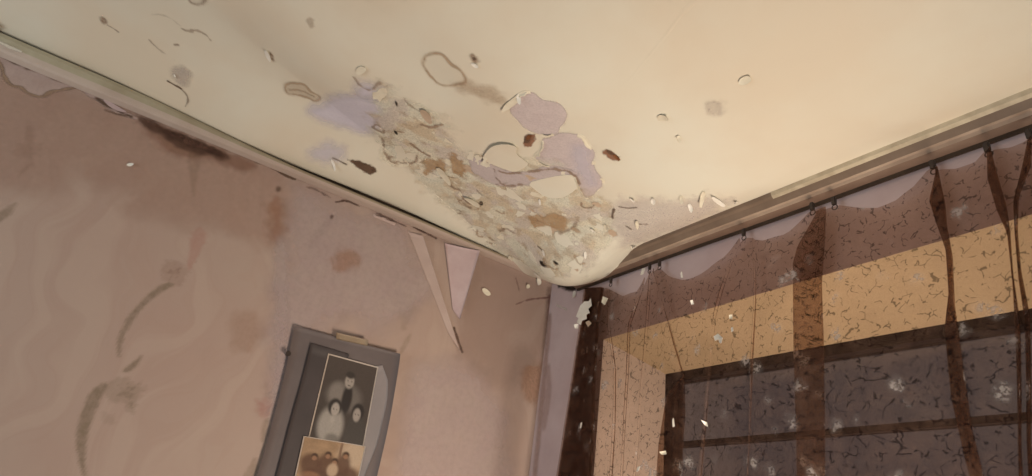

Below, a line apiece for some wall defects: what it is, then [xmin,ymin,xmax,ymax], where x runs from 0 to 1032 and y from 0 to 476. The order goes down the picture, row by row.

water stain [424,52,466,86]
water stain [142,119,228,159]
peeling [353,66,637,289]